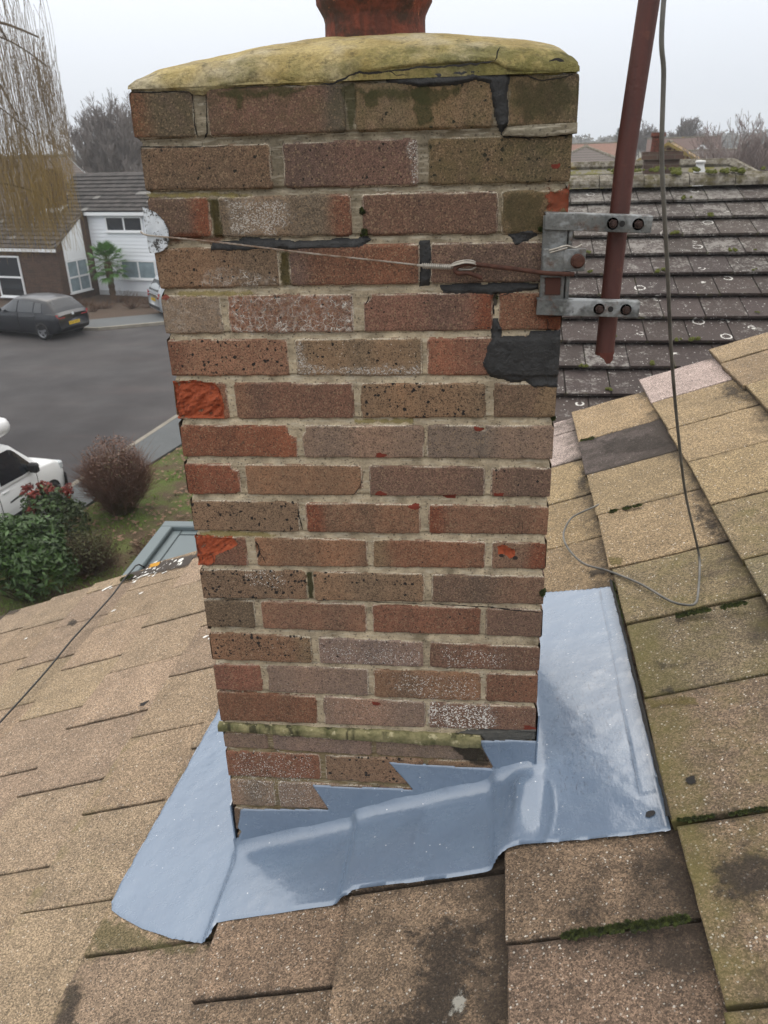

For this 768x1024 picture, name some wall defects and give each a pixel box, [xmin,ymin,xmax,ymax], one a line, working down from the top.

crack [321,48,573,85]
water stain [410,86,433,125]
spalling [173,380,225,419]
spalling [194,535,238,566]